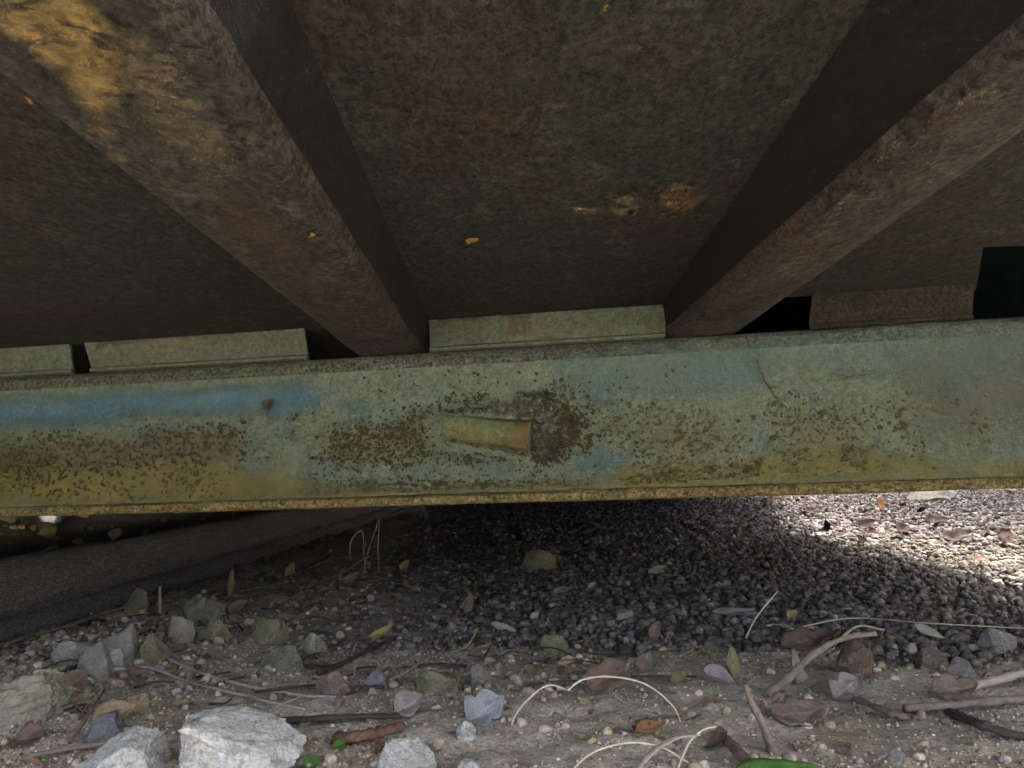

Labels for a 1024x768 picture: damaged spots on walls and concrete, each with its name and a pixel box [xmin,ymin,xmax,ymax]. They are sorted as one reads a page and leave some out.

corrosion [310,390,507,493]
corrosion [445,369,638,489]